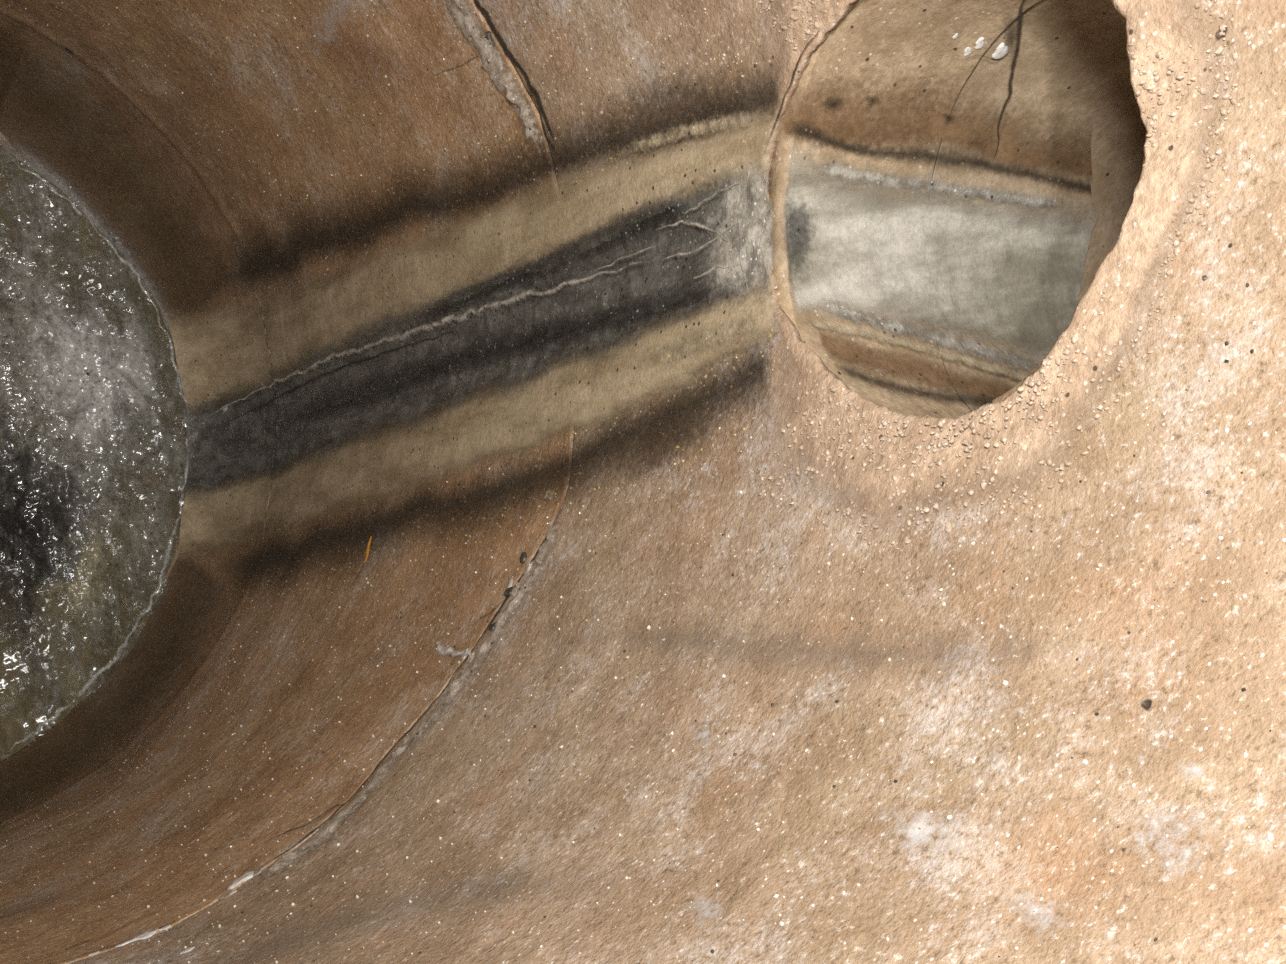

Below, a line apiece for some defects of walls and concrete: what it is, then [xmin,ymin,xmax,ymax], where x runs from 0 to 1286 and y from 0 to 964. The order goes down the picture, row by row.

crack [447,0,555,151]
crack [970,0,1024,156]